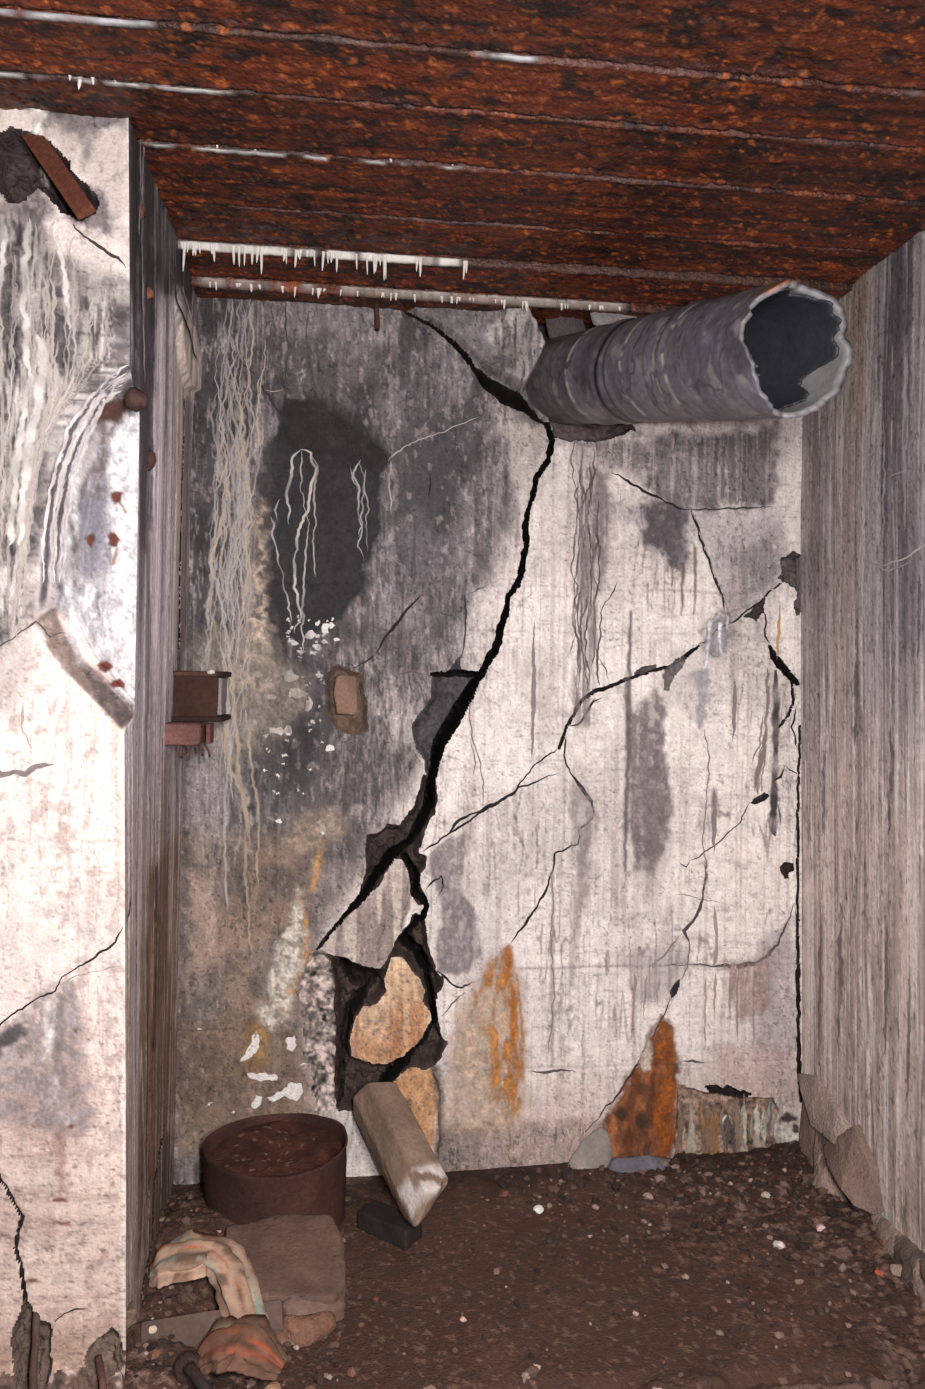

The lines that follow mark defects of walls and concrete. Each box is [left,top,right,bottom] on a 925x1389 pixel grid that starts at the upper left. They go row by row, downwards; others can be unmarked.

spalling [0,126,100,221]
water stain [0,143,186,810]
crack [350,594,424,676]
water stain [180,240,622,975]
crack [388,311,802,1135]
crack [0,893,132,1026]
spalling [240,657,479,1159]
corrosion [443,946,525,1159]
corrosion [603,1015,679,1159]
spalling [674,1085,783,1156]
crack [0,1174,28,1302]